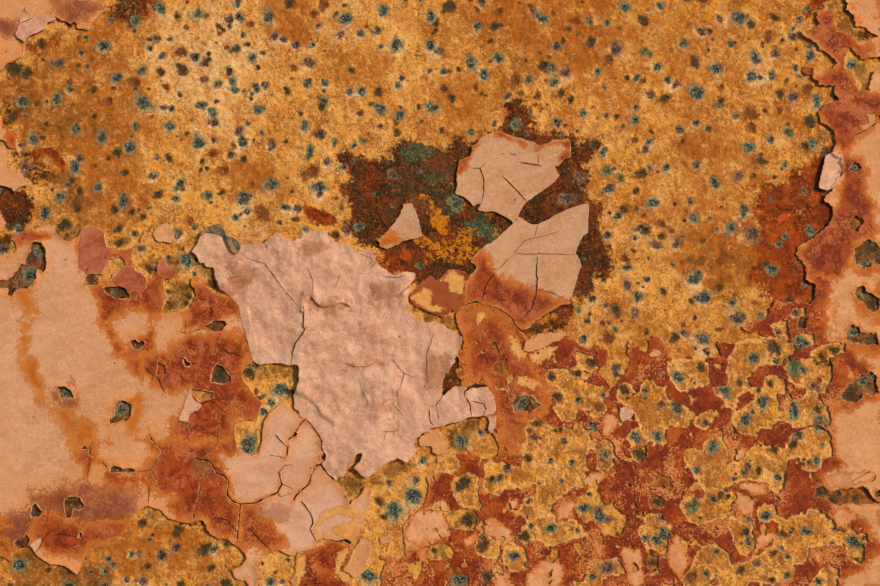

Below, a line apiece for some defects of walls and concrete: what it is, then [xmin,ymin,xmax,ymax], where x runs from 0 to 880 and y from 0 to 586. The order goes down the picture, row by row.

peeling [0,0,106,79]
spalling [191,124,248,159]
peeling [775,0,880,305]
corrosion [0,272,290,563]
corrosion [200,224,241,254]
crack [178,400,352,551]
crack [227,245,305,364]
peeling [0,132,880,586]
crack [464,384,487,413]
crack [466,227,575,351]
corrosion [378,10,880,586]
corrosion [294,541,352,586]